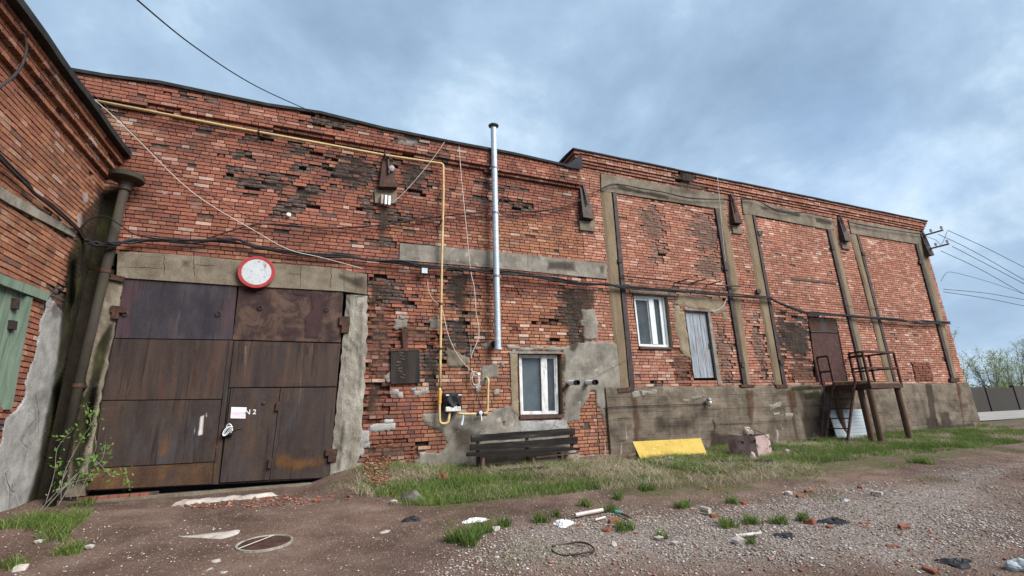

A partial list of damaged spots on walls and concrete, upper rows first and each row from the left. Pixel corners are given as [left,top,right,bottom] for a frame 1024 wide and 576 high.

spalling [299,114,356,132]
spalling [218,135,421,226]
leakage [37,186,118,501]
flaking render [359,270,741,468]
leakage [801,394,824,439]